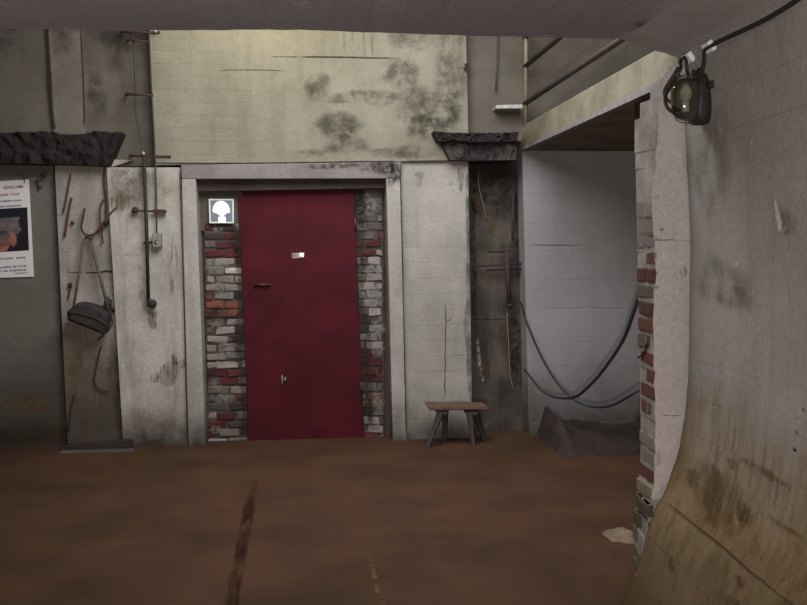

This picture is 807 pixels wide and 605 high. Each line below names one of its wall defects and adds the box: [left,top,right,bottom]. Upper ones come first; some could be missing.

flaking render [637,201,656,415]
flaking render [633,429,659,575]
crack [669,504,793,605]